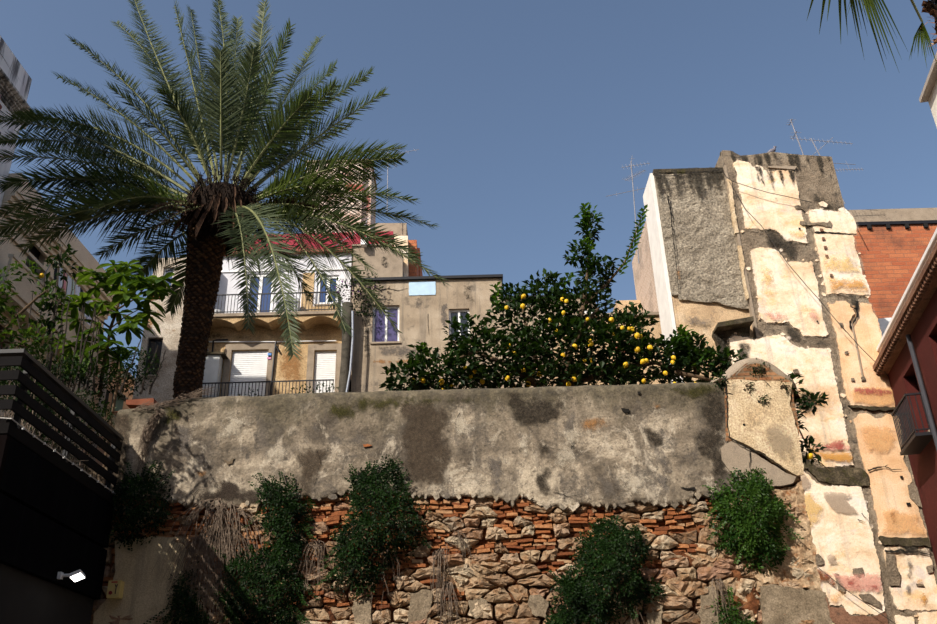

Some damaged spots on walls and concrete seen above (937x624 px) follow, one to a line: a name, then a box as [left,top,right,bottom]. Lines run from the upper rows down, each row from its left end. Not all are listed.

damp [653,167,723,205]
damp [731,151,832,188]
flaking render [726,159,937,624]
damp [509,393,563,455]
damp [401,403,474,484]
damp [557,430,579,466]
spalling [400,490,579,513]
damp [536,468,550,494]
spalling [590,487,723,510]